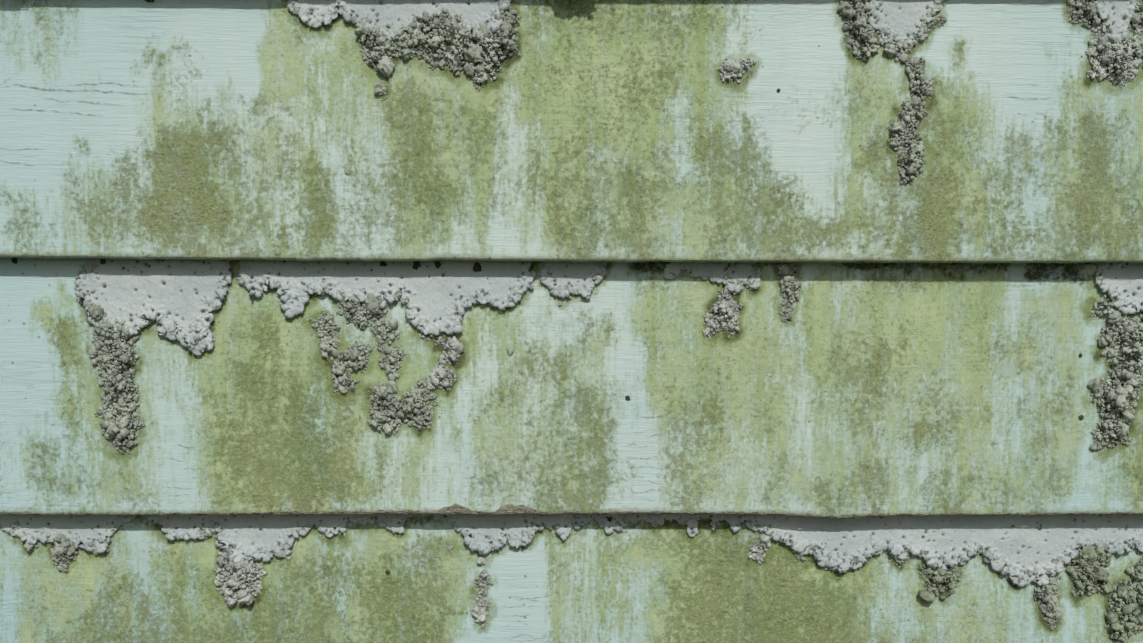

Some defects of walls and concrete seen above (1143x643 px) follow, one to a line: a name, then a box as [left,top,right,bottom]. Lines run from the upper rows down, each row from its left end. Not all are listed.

water stain [71,81,504,257]
peeling [283,0,522,106]
water stain [611,0,1010,289]
peeling [836,0,947,186]
water stain [985,111,1143,284]
peeling [1064,0,1143,92]
water stain [211,314,364,513]
peeling [74,258,612,459]
peeling [1073,262,1143,459]
water stain [47,541,463,643]
peeling [0,503,1143,643]
water stain [658,521,892,643]